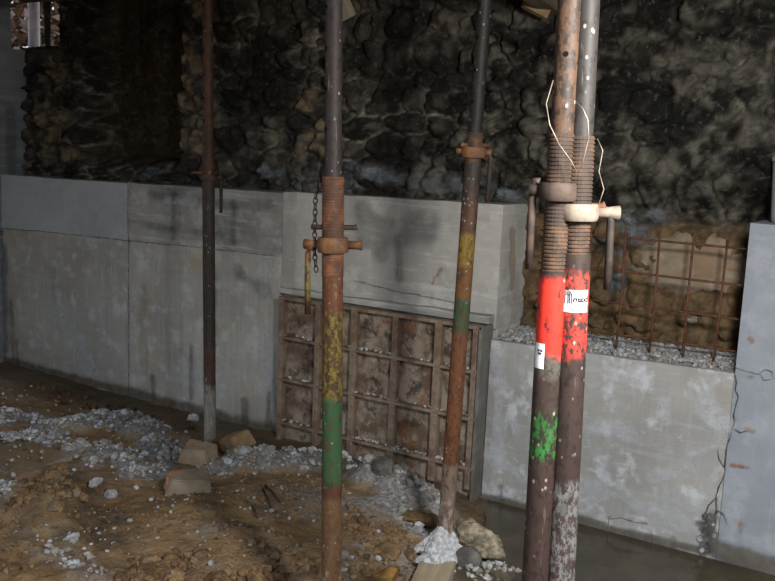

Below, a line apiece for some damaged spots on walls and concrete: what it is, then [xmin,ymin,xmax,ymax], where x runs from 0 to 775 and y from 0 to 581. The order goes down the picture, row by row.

spalling [587,227,748,362]
crack [700,367,775,553]